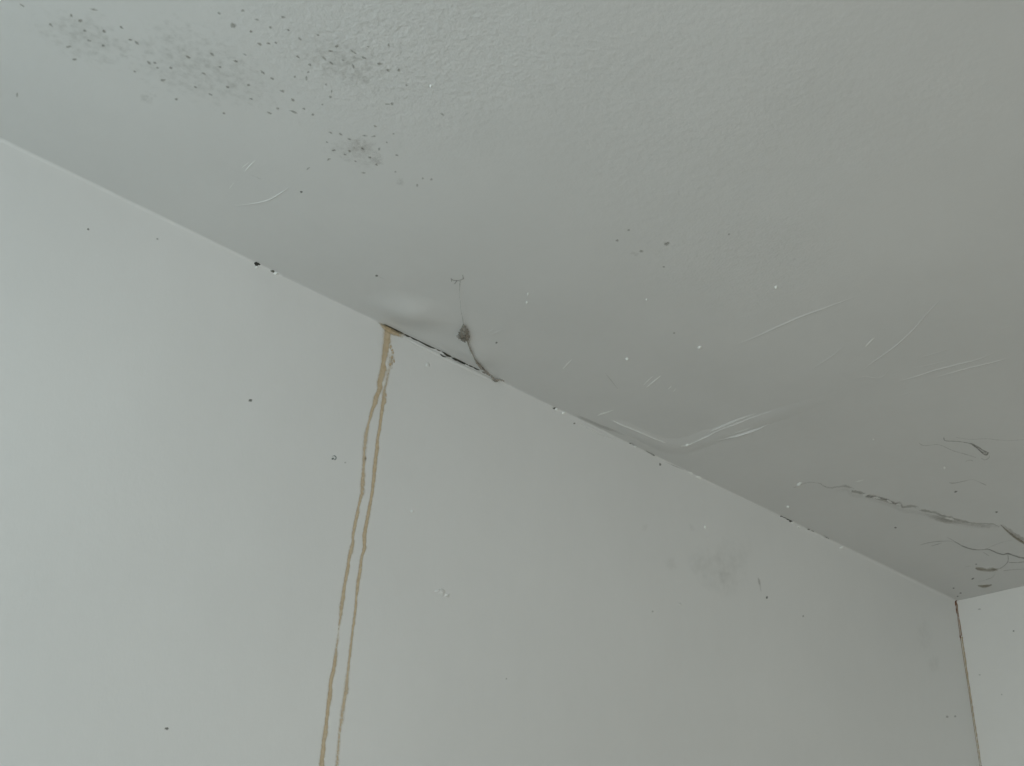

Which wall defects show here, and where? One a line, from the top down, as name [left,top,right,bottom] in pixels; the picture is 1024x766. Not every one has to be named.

leakage [319,326,399,766]
crack [382,324,493,381]